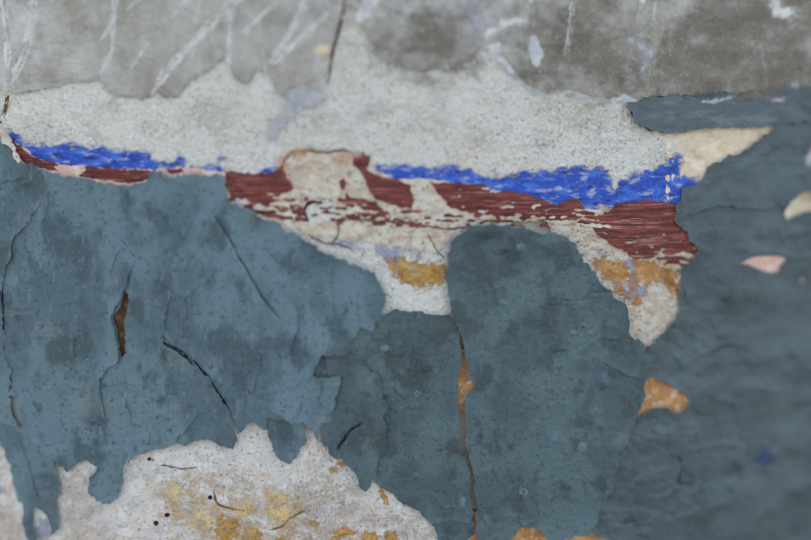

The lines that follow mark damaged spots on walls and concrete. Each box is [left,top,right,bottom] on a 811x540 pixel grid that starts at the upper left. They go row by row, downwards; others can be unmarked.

crack [327,0,346,84]
spalling [0,3,811,229]
spalling [741,256,788,273]
crack [162,339,228,409]
peeling [0,194,699,540]